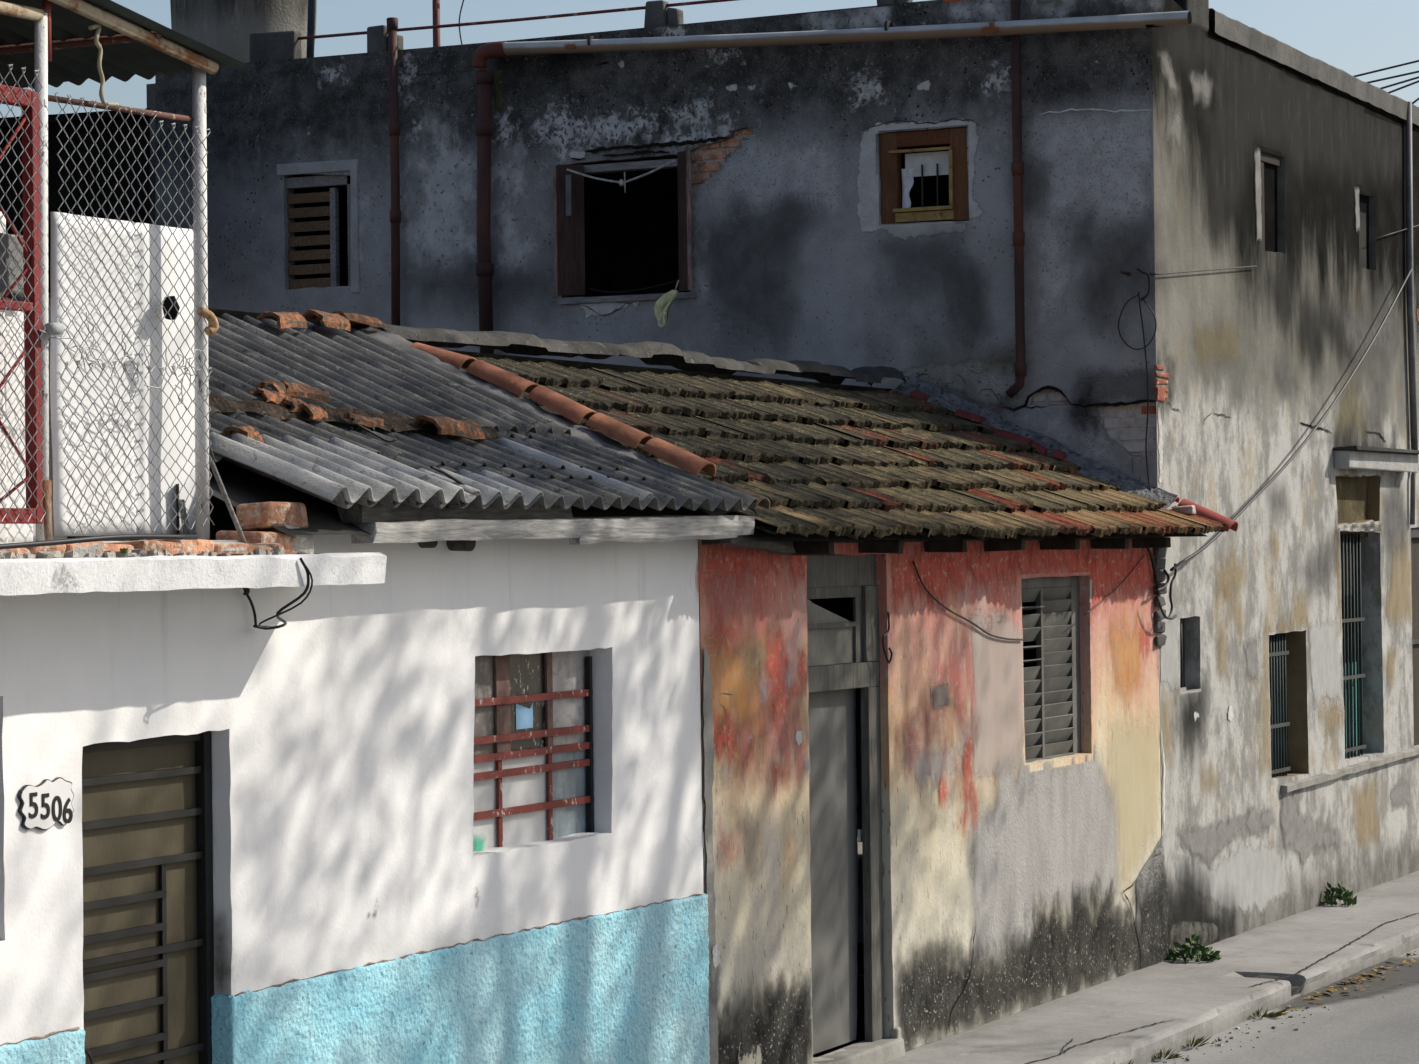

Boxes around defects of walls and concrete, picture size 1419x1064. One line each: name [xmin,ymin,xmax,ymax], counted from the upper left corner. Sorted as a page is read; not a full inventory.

peeling [569,151,585,159]
peeling [691,128,855,226]
water stain [1159,24,1405,240]
water stain [706,207,795,328]
crack [898,370,1231,424]
water stain [1271,275,1397,447]
peeling [710,617,810,784]
water stain [717,975,813,1064]
water stain [898,895,1140,1052]